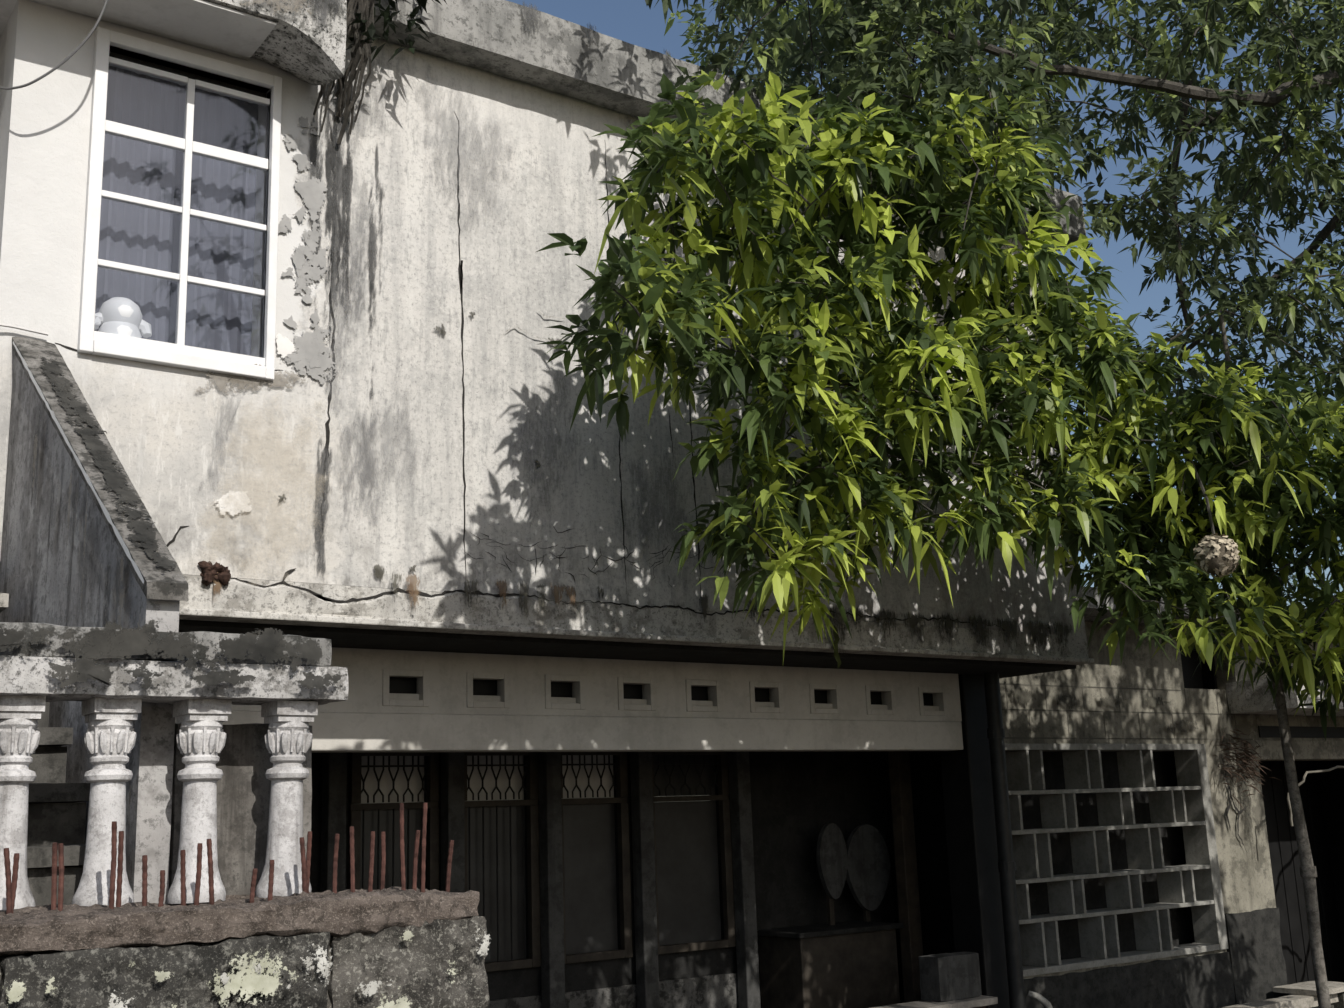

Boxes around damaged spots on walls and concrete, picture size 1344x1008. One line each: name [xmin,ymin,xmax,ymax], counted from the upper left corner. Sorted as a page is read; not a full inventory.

peeling [276,116,337,385]
water stain [309,84,353,318]
water stain [369,146,383,330]
water stain [40,357,177,582]
water stain [0,410,347,695]
peeling [215,490,252,516]
water stain [196,364,308,396]
corrosion [391,574,420,605]
corrosion [464,580,478,610]
corrosion [496,580,577,615]
crack [231,113,1003,627]
water stain [826,605,1073,669]